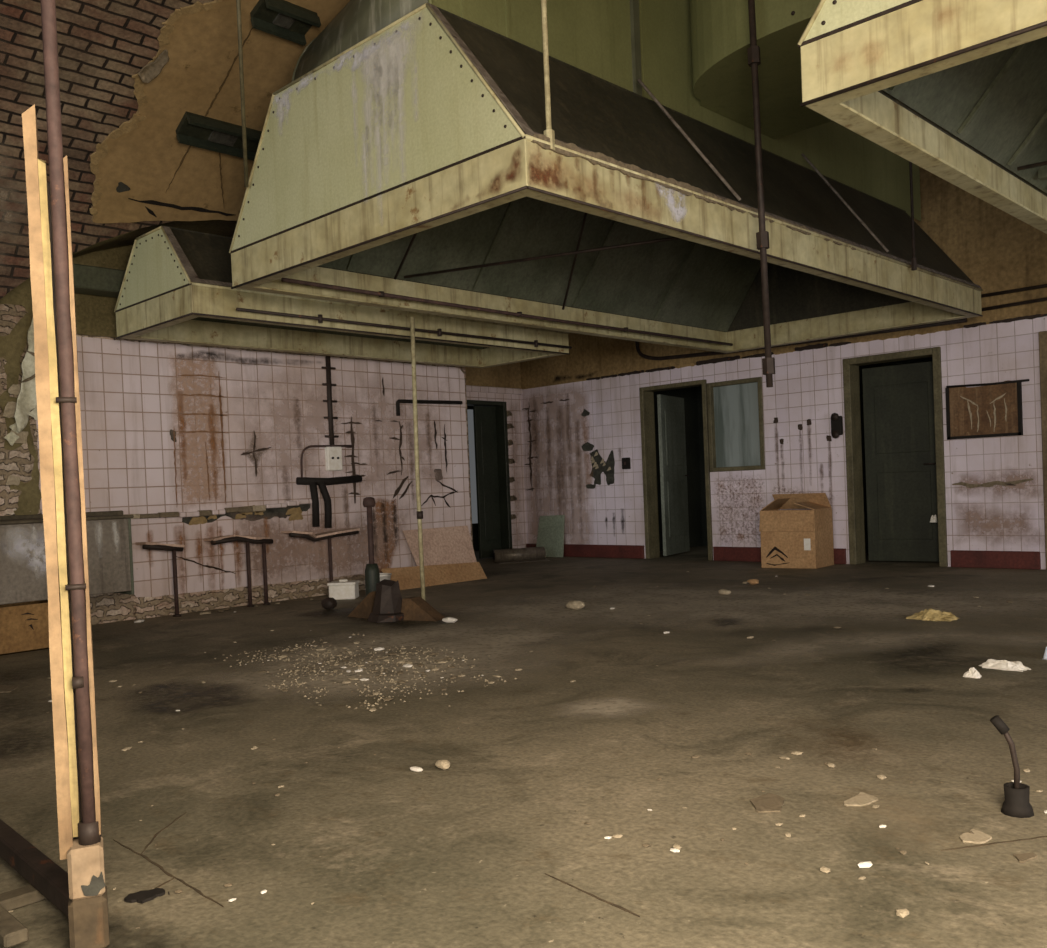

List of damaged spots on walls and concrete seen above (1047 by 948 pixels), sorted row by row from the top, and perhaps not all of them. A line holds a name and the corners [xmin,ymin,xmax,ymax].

flaking render [148,0,224,64]
flaking render [90,73,148,216]
corrosion [491,152,561,191]
spalling [0,277,42,516]
corrosion [174,359,227,504]
leakage [513,391,589,544]